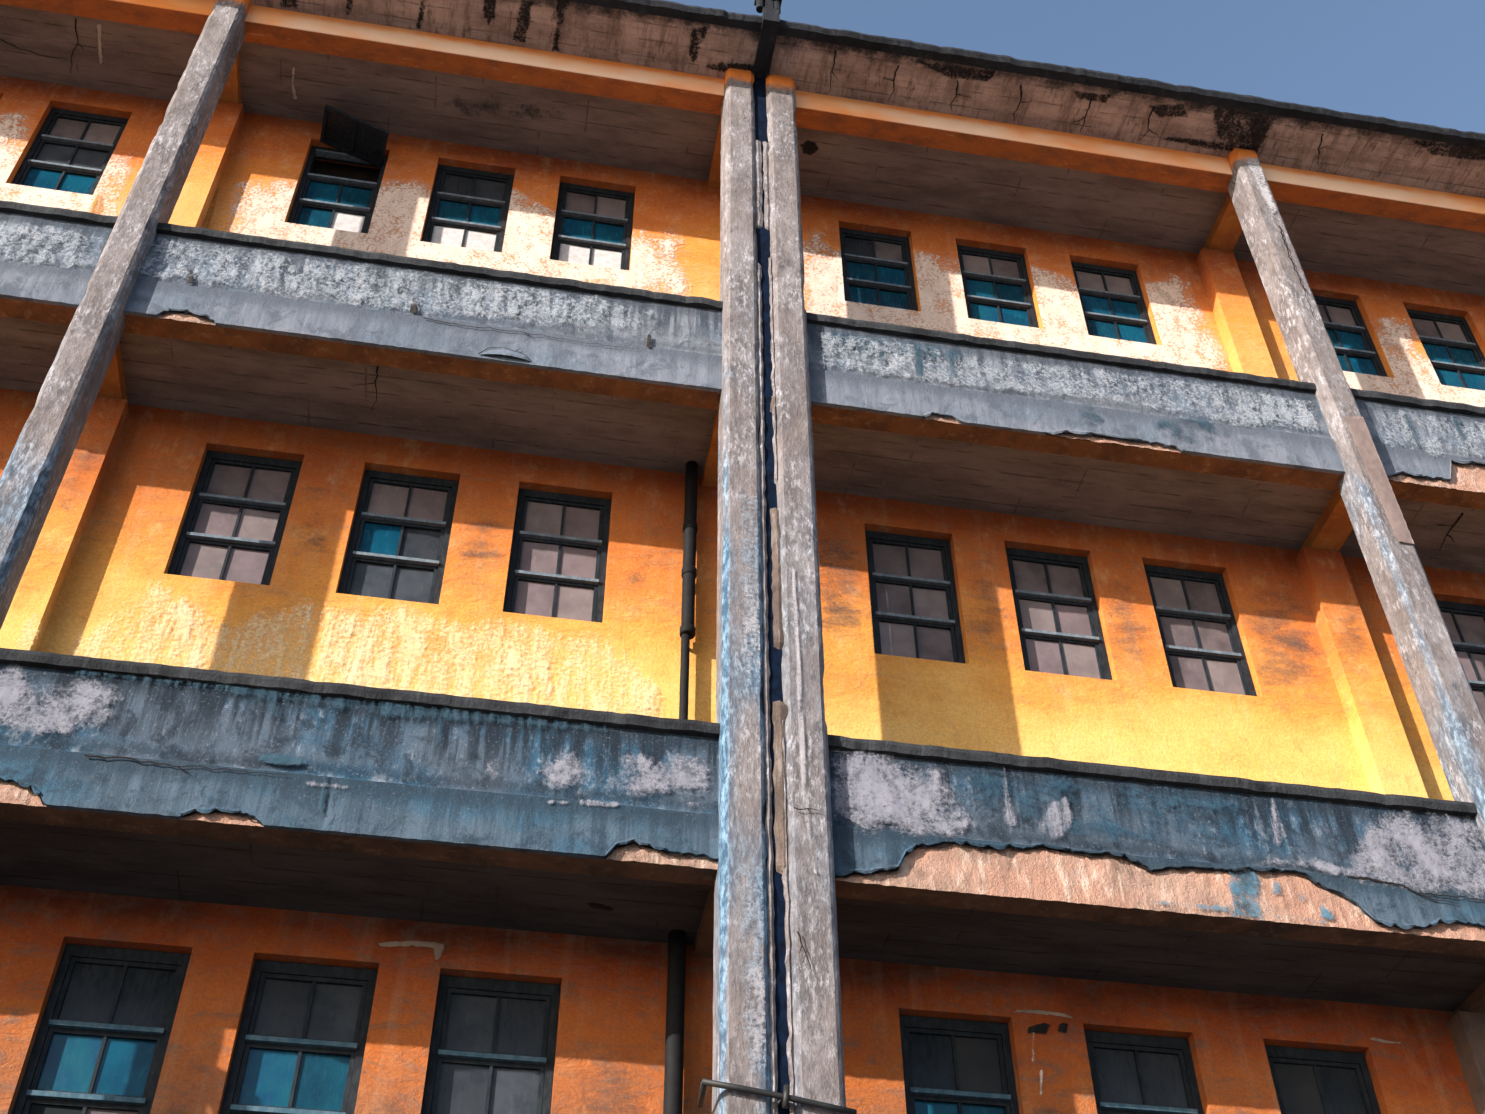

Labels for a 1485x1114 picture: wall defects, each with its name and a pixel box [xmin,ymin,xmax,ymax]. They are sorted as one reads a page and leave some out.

crack [0,19,84,74]
leakage [483,0,497,25]
leakage [512,0,534,43]
leakage [552,0,570,51]
crack [1013,85,1033,121]
peeling [1343,317,1485,544]
peeling [792,569,809,828]
spalling [0,779,46,807]
spalling [180,806,263,827]
spalling [831,751,1485,941]